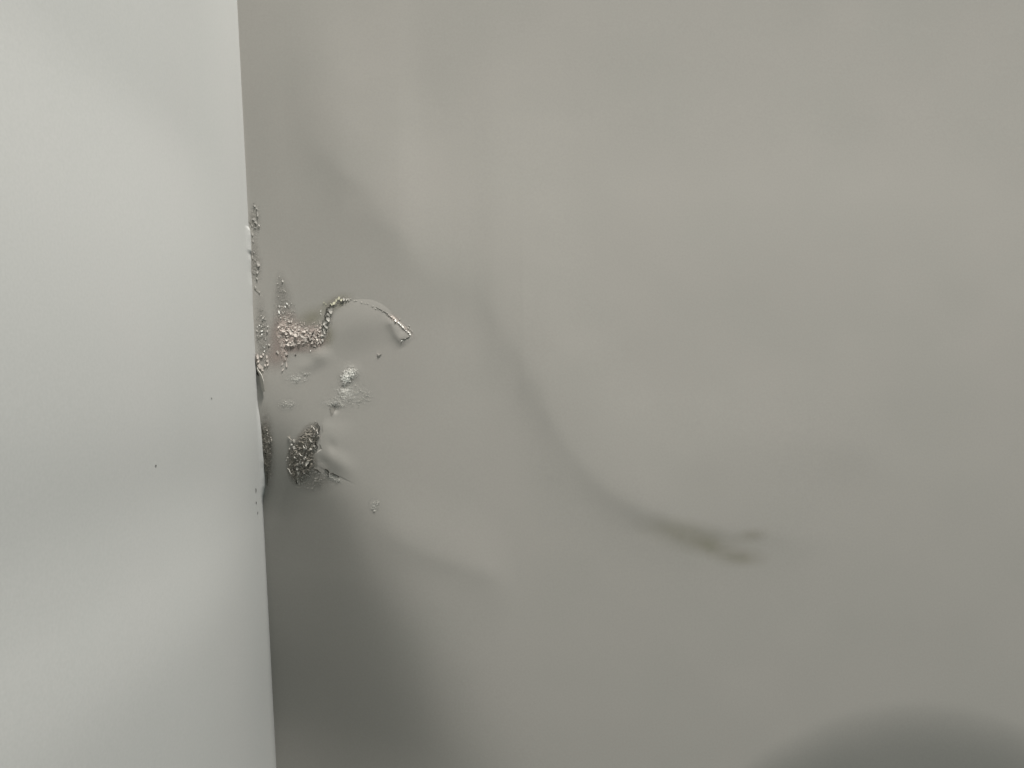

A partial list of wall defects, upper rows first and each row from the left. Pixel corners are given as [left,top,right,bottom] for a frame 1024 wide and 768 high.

peeling [256,276,413,371]
peeling [261,423,273,481]
peeling [286,421,320,485]